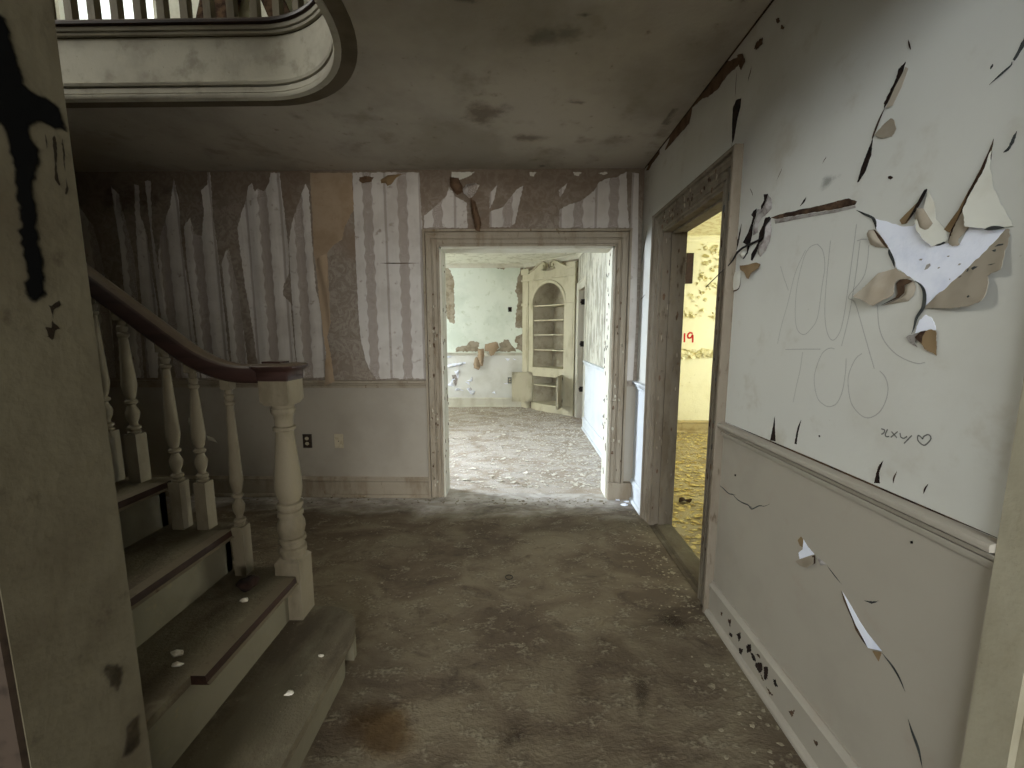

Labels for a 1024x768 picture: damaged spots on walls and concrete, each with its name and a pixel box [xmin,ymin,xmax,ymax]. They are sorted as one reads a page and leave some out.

peeling [645,0,784,171]
crack [872,108,885,139]
crack [989,63,1012,85]
spalling [733,194,772,292]
flaking render [876,219,1005,333]
peeling [428,294,475,487]
crack [722,422,997,538]
flaking render [798,539,814,559]
spalling [721,612,778,695]